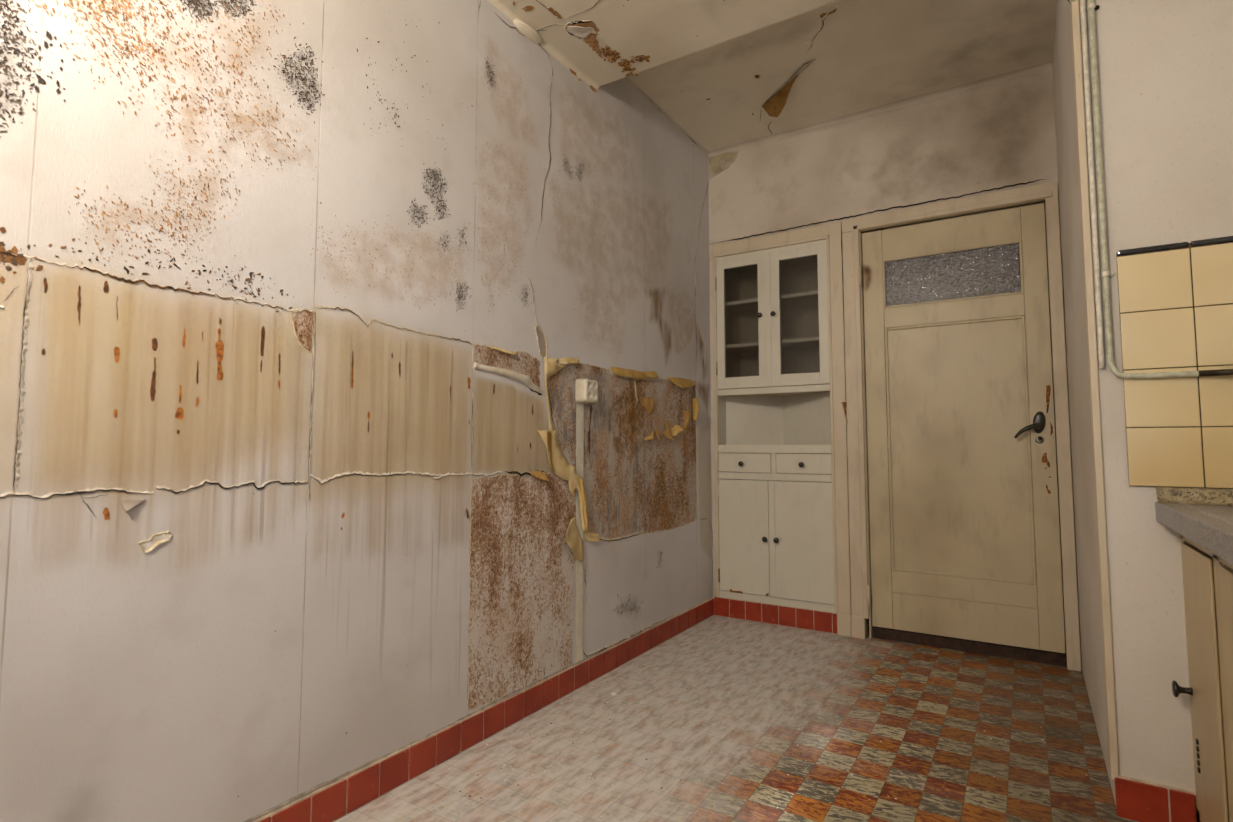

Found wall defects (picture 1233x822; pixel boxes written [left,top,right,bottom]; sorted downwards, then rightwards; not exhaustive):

mould [179,0,260,27]
mould [0,0,65,137]
mould [272,37,325,124]
peeling [601,45,650,76]
crack [479,0,602,241]
rust [150,338,158,401]
rust [175,361,199,434]
rust [202,318,224,380]
crack [0,259,502,517]